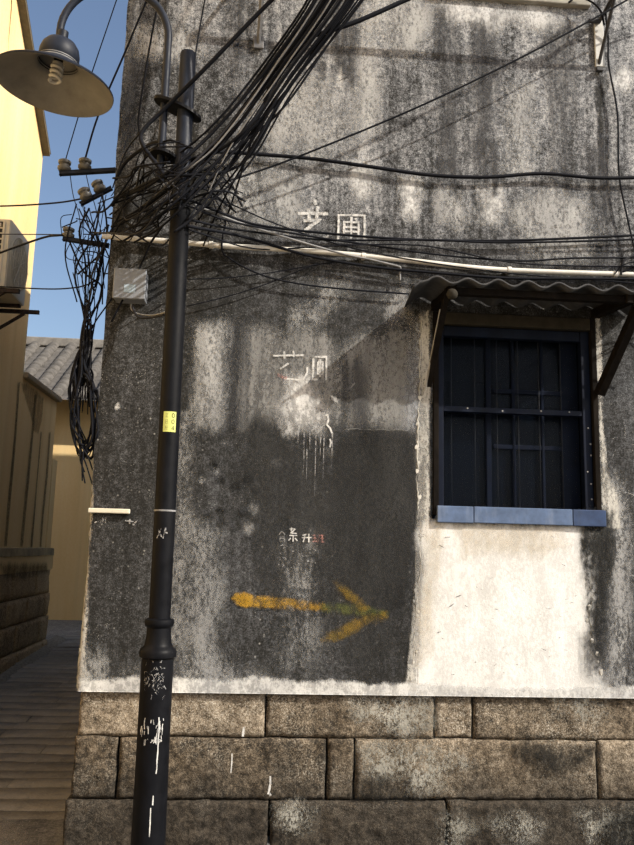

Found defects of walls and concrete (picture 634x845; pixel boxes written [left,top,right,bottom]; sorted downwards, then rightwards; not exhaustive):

leakage [269,0,457,181]
leakage [474,23,535,194]